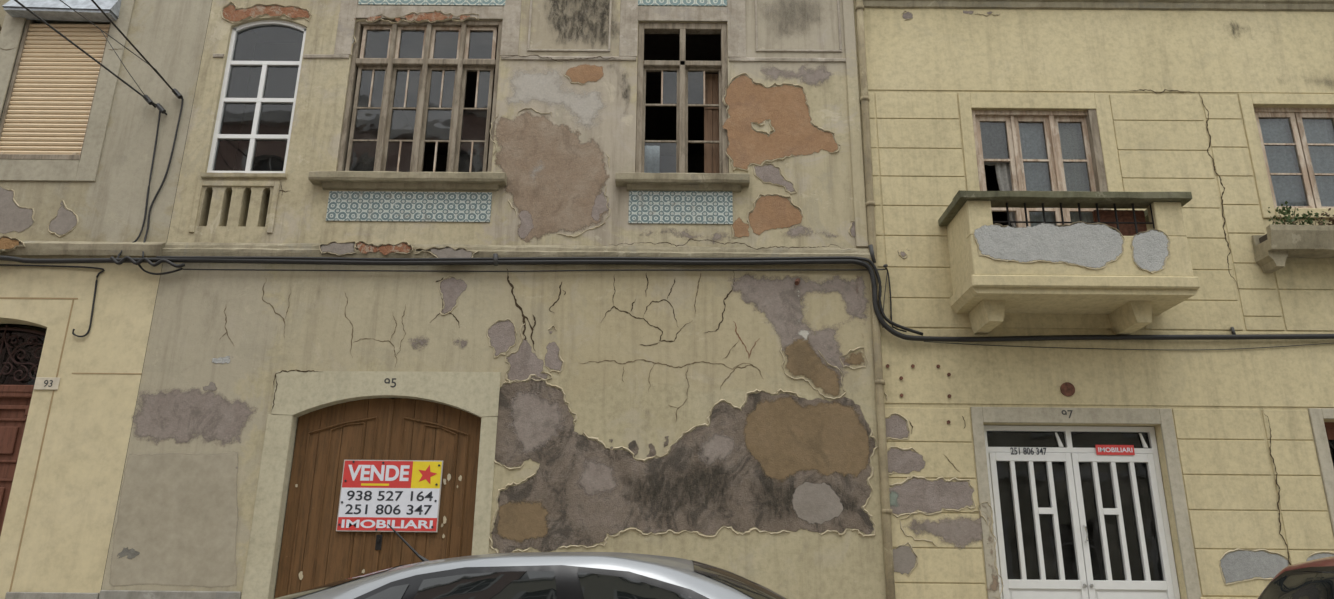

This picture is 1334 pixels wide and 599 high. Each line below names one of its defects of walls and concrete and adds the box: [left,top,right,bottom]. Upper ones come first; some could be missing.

leakage [549,0,614,44]
peeling [0,187,79,253]
peeling [726,153,856,237]
peeling [973,221,1170,273]
crack [1129,89,1238,289]
crack [507,269,566,349]
crack [581,239,850,420]
peeling [133,382,254,445]
crack [271,370,319,413]
peeling [819,392,1003,599]
crack [1262,408,1291,565]
peeling [559,526,789,549]